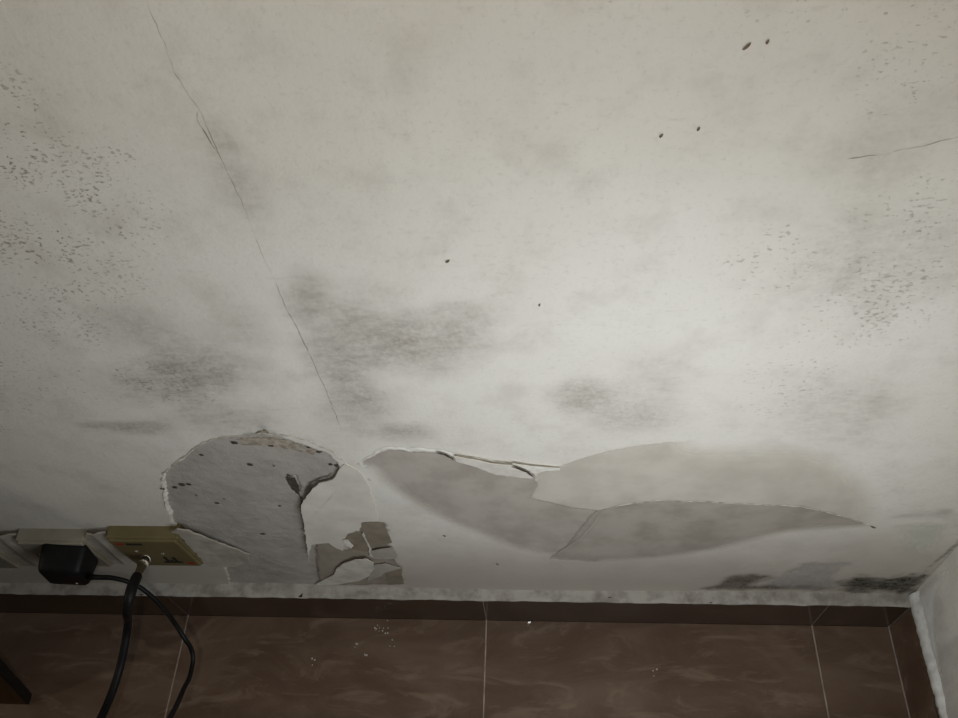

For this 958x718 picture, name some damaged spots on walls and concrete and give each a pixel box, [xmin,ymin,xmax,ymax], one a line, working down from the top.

peeling [160,431,876,586]
leakage [843,576,923,593]